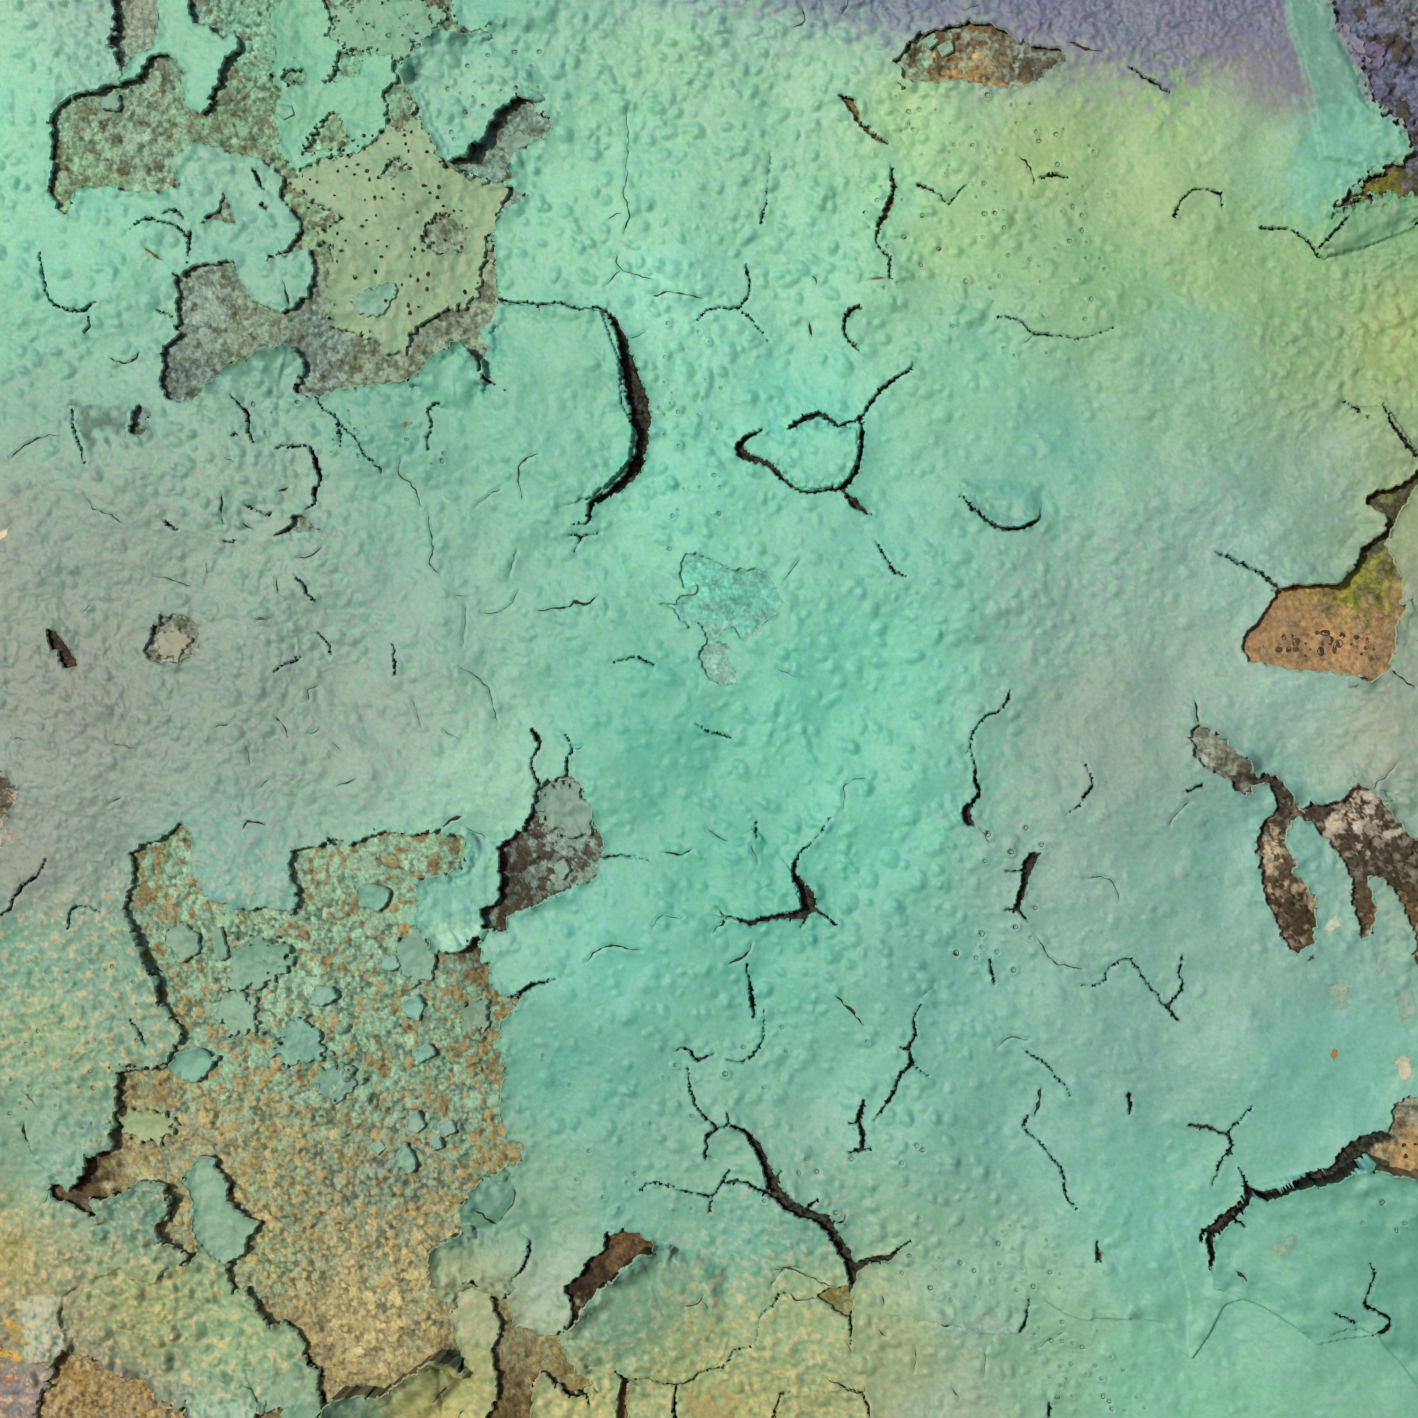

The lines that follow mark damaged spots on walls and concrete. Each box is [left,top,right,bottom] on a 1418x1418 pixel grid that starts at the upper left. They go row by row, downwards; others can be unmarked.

peeling [46,0,552,416]
crack [496,109,769,553]
crack [808,94,969,352]
peeling [892,19,1067,90]
peeling [1332,0,1418,209]
crack [734,361,914,578]
peeling [1241,469,1418,683]
crack [960,689,1186,1022]
peeling [1187,724,1418,966]
peeling [18,774,657,1418]
crack [552,778,916,1418]
crack [848,987,932,1155]